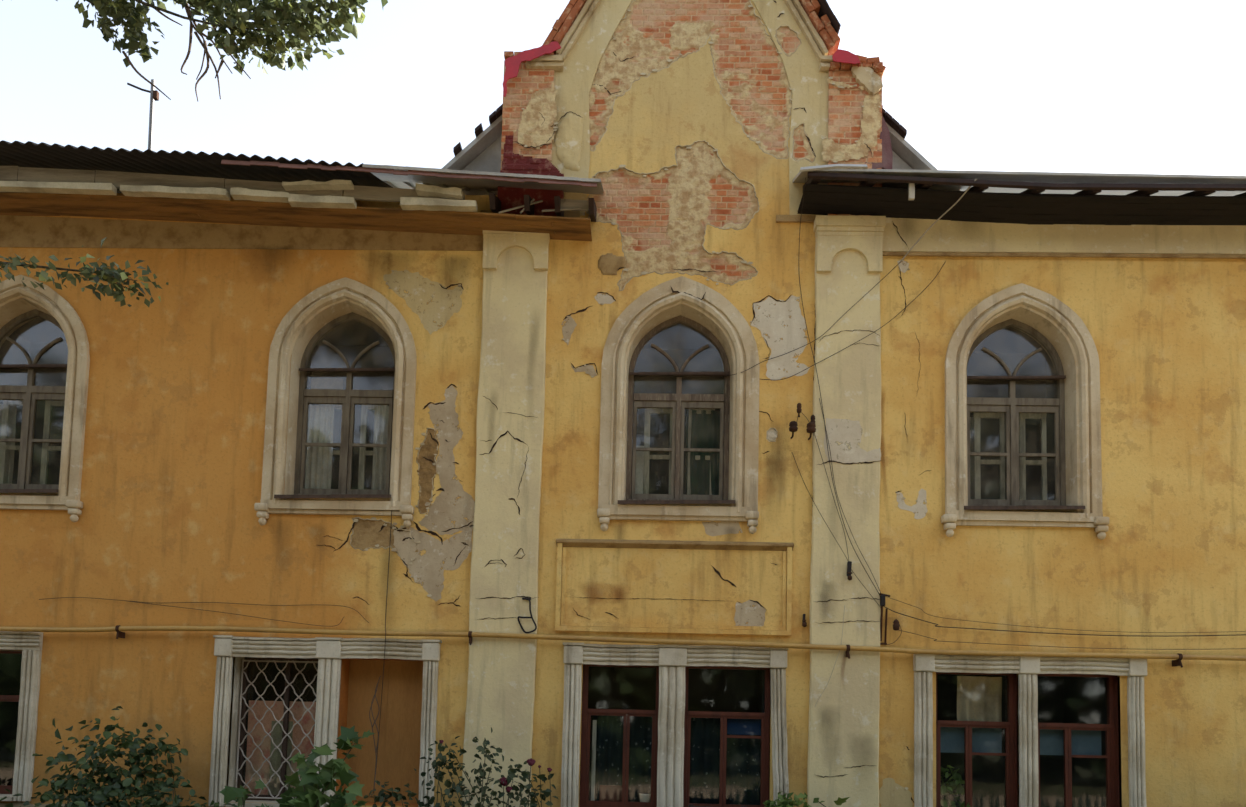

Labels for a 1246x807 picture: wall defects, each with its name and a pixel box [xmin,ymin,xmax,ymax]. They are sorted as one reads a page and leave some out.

flaking render [589,0,882,163]
flaking render [514,88,558,149]
flaking render [586,140,760,305]
peeling [383,269,464,335]
peeling [750,295,809,381]
crack [423,384,537,515]
peeling [350,385,475,601]
peeling [895,488,928,519]
crack [318,521,525,567]
crack [439,596,536,620]
peeling [734,600,766,626]